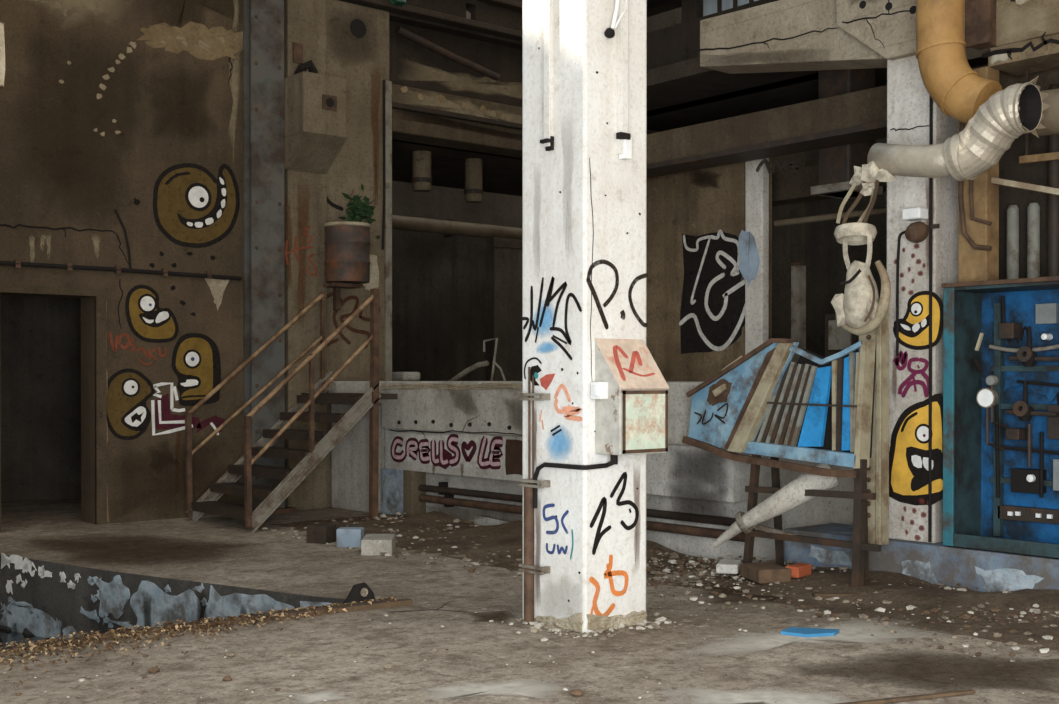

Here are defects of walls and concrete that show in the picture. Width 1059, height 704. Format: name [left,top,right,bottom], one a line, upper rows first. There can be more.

spalling [96,21,243,99]
crack [693,0,909,53]
crack [982,32,1059,59]
spalling [0,553,412,652]
peeling [901,560,937,583]
peeling [975,566,1044,592]